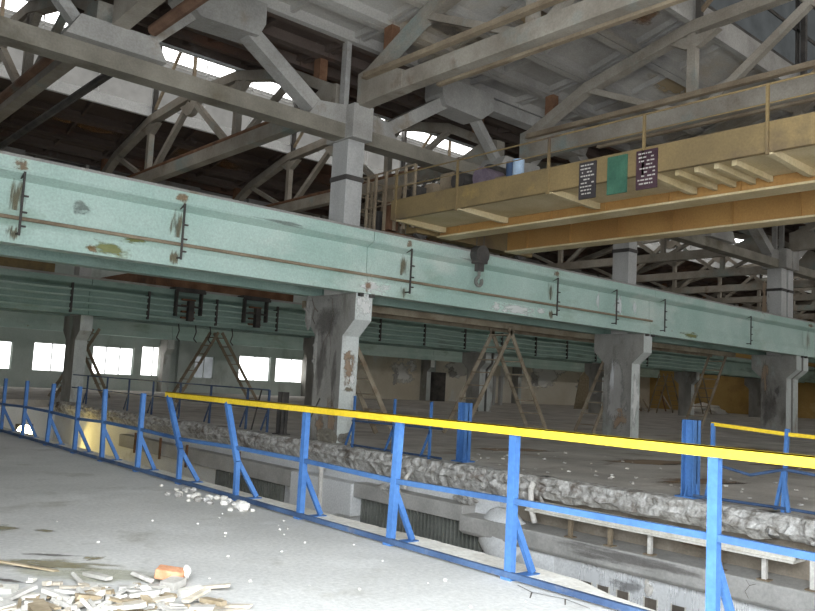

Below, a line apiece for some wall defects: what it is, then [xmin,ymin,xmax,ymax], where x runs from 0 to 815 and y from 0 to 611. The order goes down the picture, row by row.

rust [10,184,22,210]
peeling [493,302,545,315]